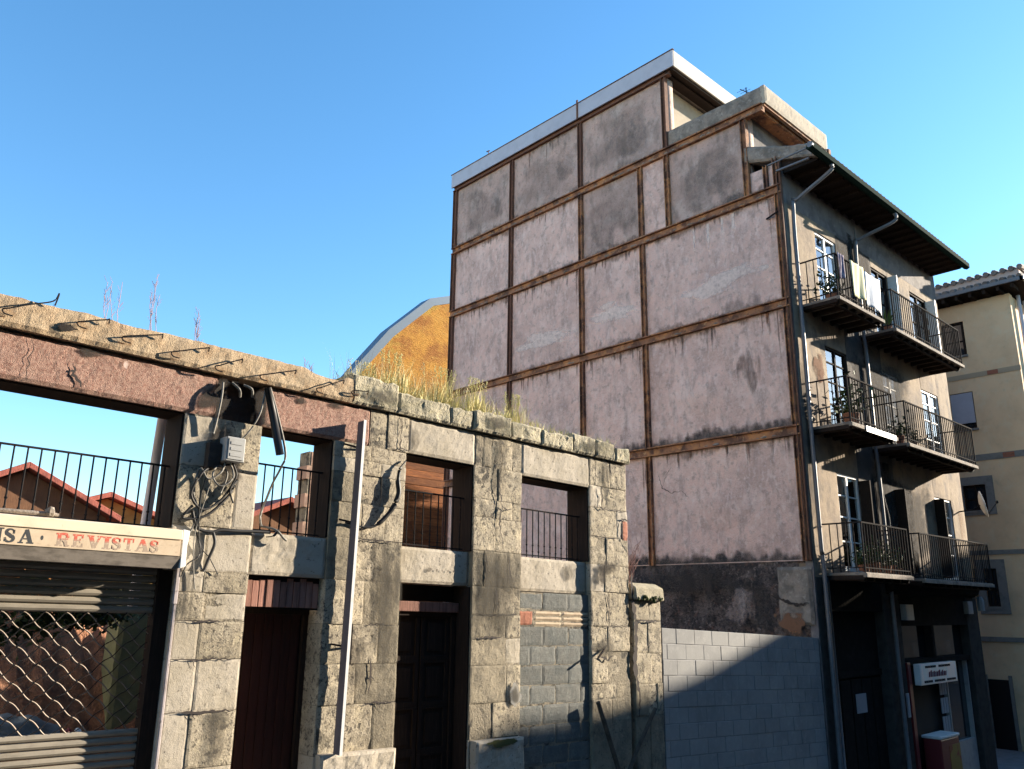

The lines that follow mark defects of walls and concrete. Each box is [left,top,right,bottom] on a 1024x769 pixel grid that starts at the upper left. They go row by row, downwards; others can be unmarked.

leakage [678,419,791,462]
leakage [598,551,800,606]
spalling [726,566,816,636]